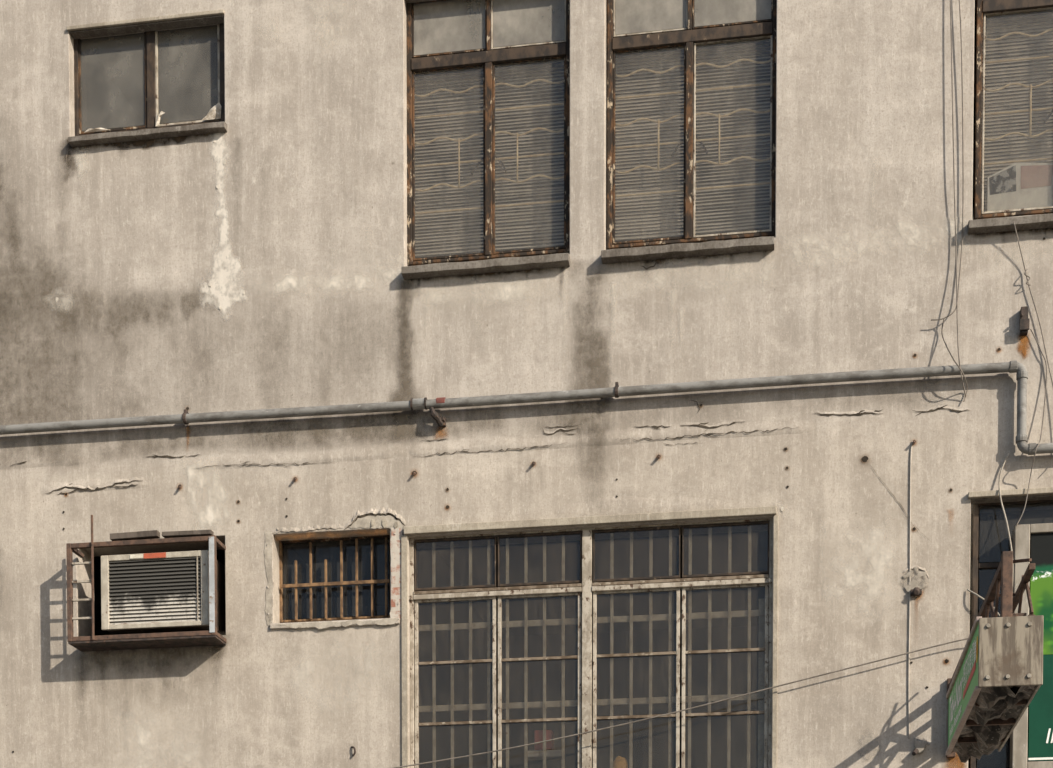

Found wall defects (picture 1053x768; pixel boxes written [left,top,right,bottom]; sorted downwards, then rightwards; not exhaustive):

water stain [64,133,213,175]
peeling [201,133,247,319]
water stain [275,256,542,304]
water stain [0,222,168,423]
corrosion [1018,335,1029,357]
water stain [243,315,419,445]
crack [415,425,579,457]
water stain [569,318,609,461]
crack [624,400,883,445]
crack [912,405,970,415]
crack [45,454,328,495]
spalling [264,507,406,630]